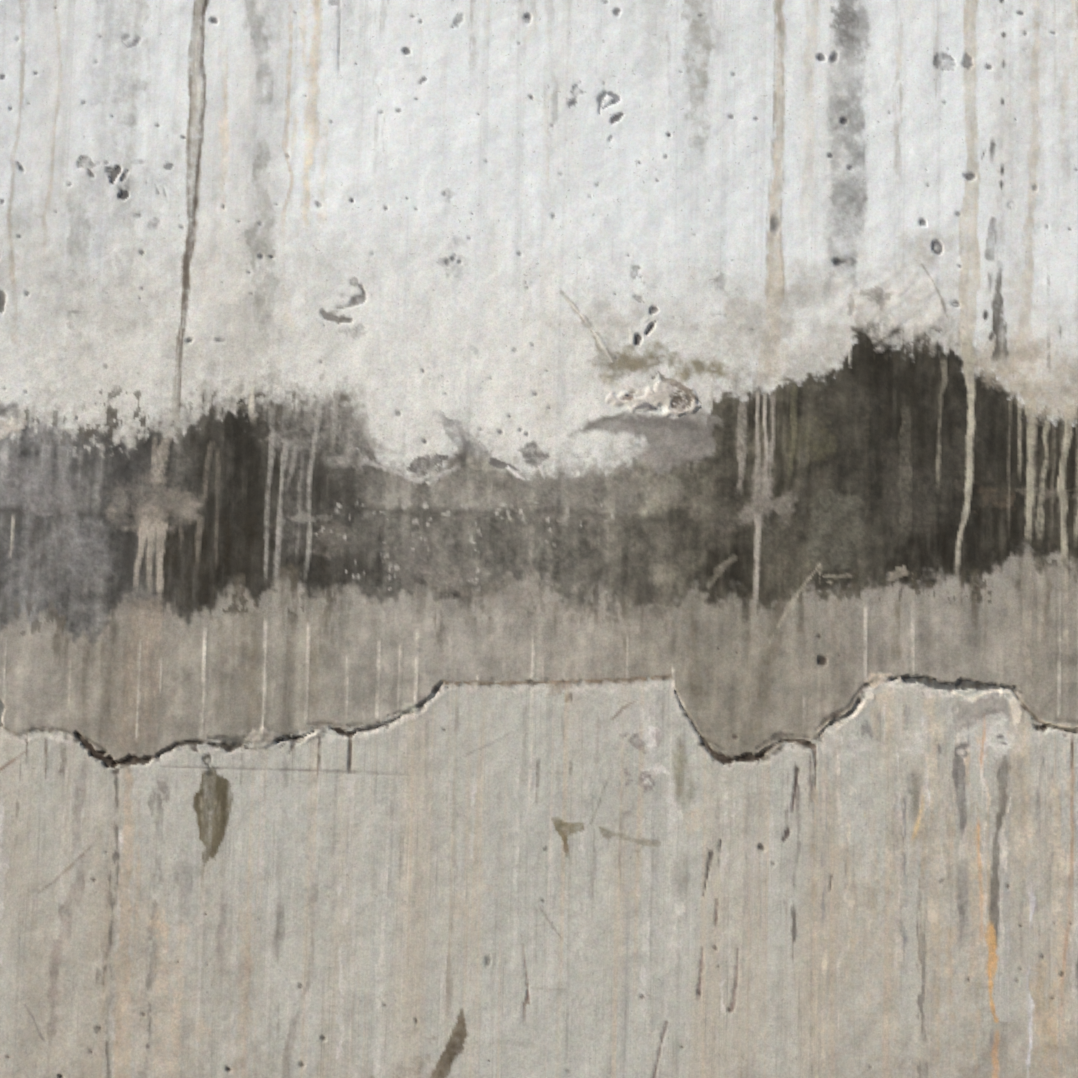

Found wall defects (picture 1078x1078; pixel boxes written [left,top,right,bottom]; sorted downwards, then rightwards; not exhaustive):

corrosion [24,735,70,784]
leakage [0,730,361,1078]
crack [0,680,453,908]
leakage [370,794,410,1078]
leakage [437,699,462,1058]
crack [490,674,567,690]
leakage [533,711,570,1032]
leakage [634,845,658,1044]
leakage [710,783,751,1078]
crack [826,873,834,893]
crack [660,669,1078,844]
corrosion [839,688,1077,1078]